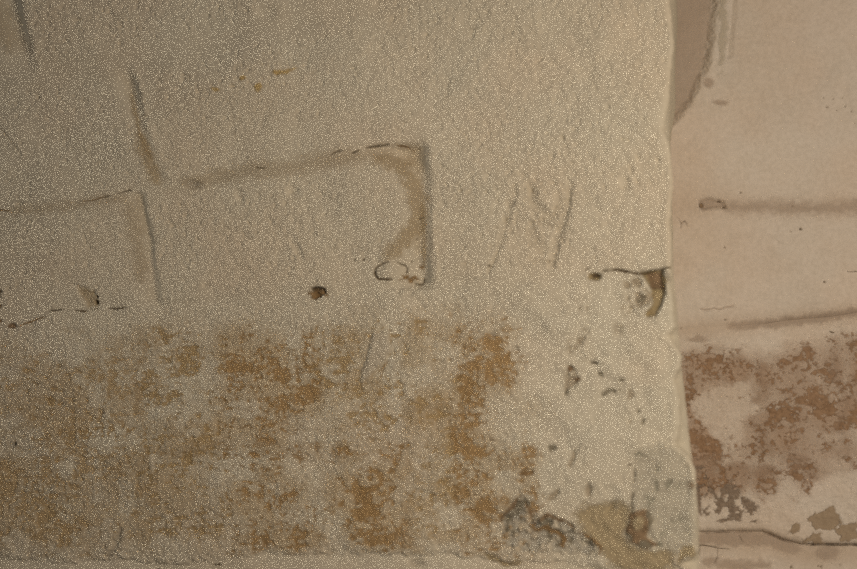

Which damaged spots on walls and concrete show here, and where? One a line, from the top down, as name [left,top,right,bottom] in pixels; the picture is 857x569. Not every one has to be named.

spalling [622,270,667,316]
peeling [0,317,556,566]
peeling [682,332,857,498]
spalling [575,485,696,569]
peeling [789,506,857,545]